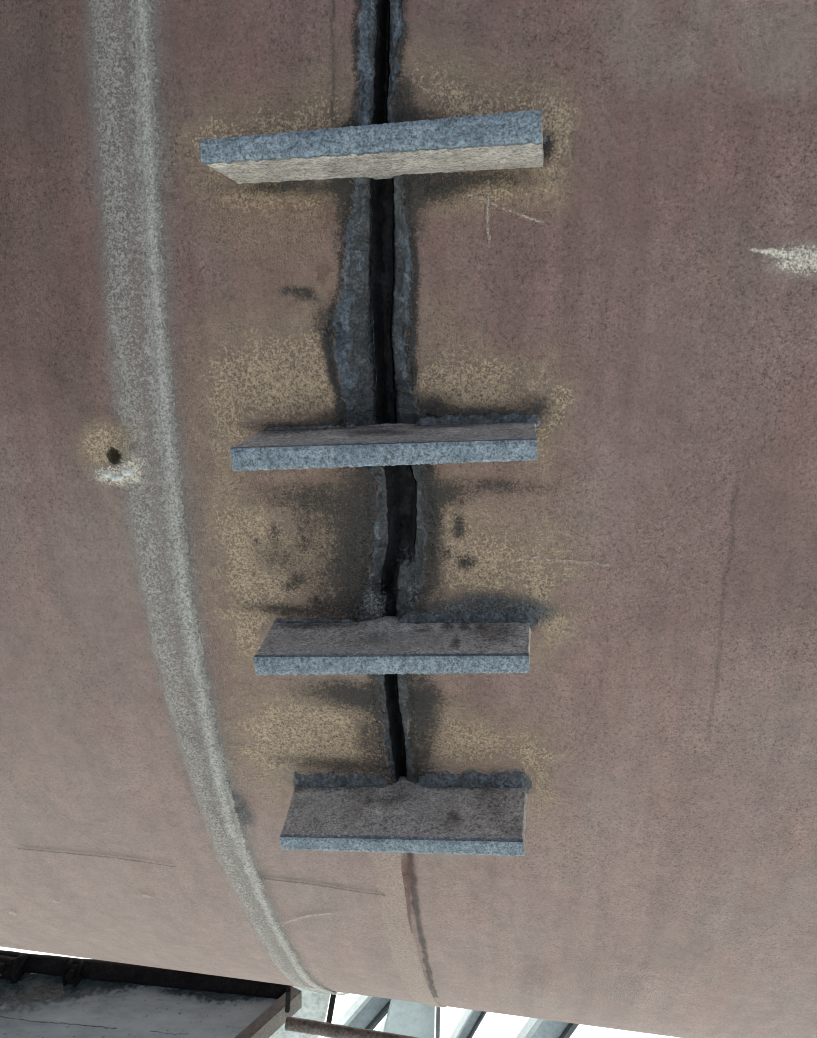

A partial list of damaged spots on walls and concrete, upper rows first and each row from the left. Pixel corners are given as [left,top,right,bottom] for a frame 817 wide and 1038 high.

crack [372,0,390,124]
crack [371,178,397,425]
spalling [82,423,146,486]
crack [382,465,416,619]
crack [385,673,406,782]